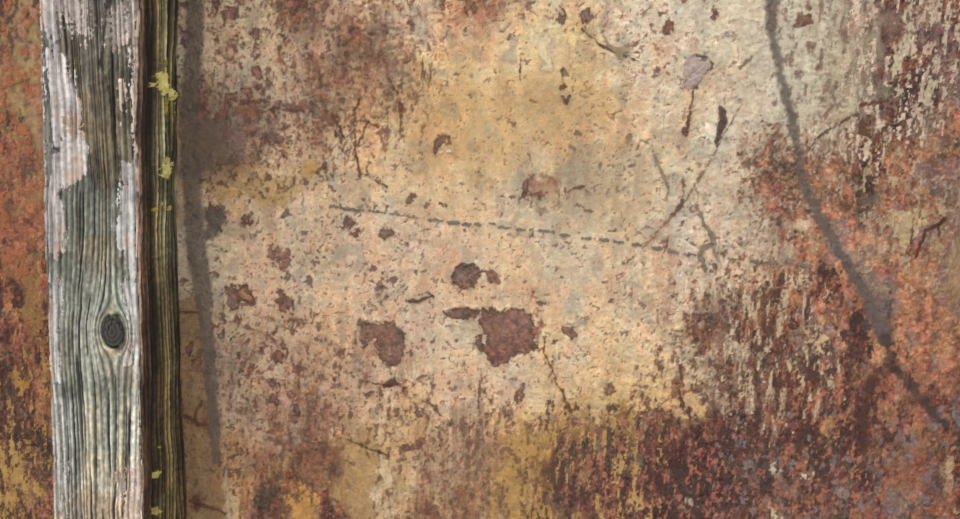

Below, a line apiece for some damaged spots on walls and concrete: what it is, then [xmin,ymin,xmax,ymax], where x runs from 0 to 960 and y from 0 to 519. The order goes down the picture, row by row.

corrosion [0,0,55,519]
corrosion [197,0,960,519]
peeling [680,54,714,89]